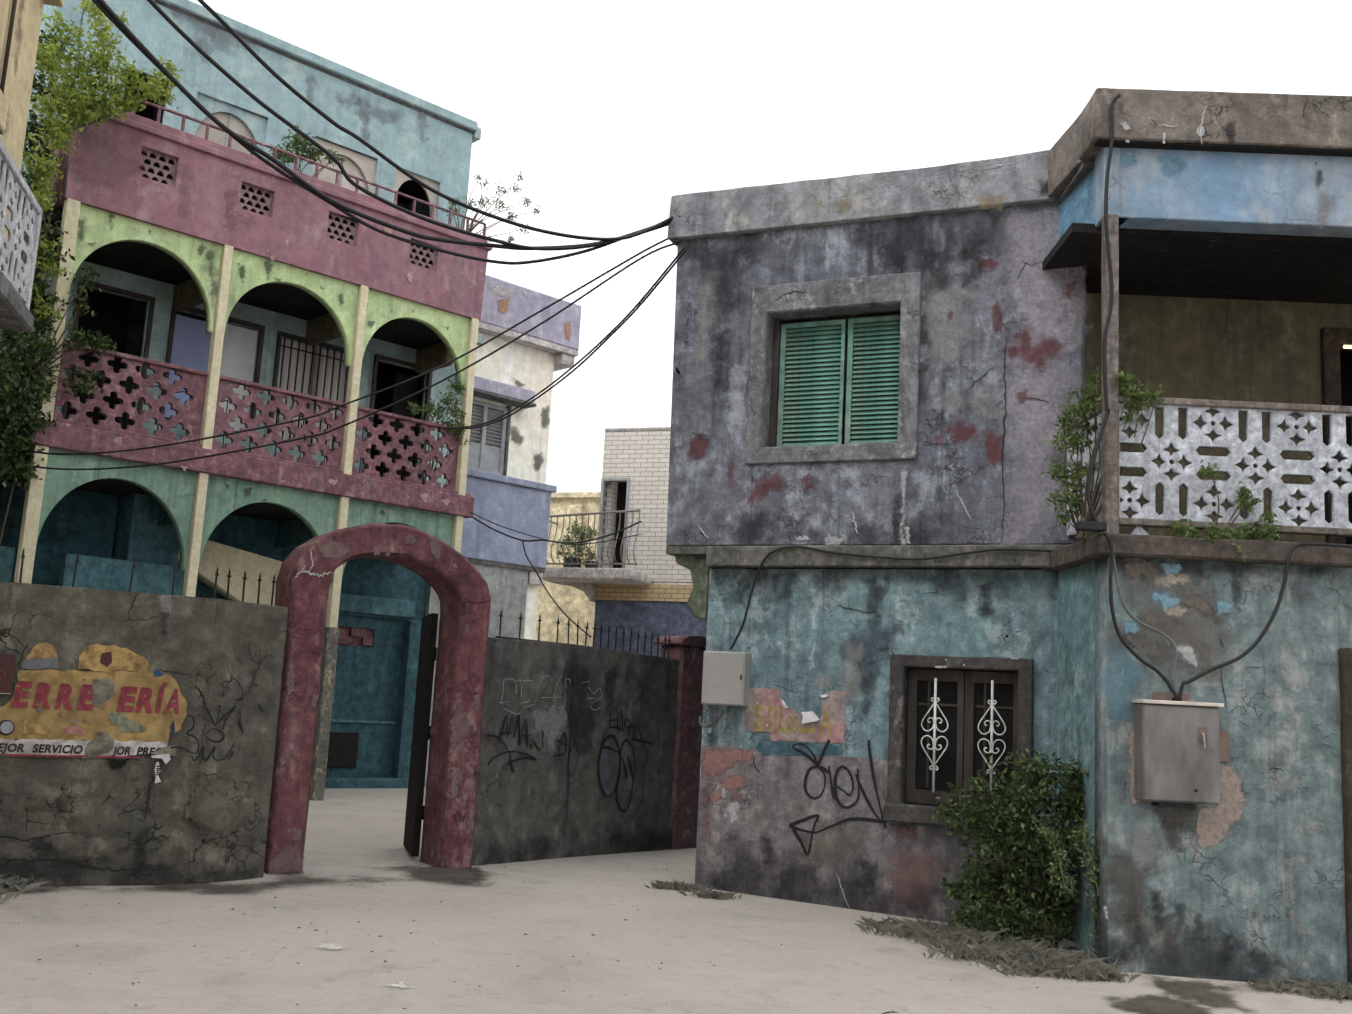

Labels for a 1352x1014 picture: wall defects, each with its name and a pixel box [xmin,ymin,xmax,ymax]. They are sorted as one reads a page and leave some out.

water stain [865,217,997,288]
peeling [935,183,1084,545]
water stain [892,471,927,545]
crack [295,551,332,577]
peeling [1152,563,1191,617]
crack [157,640,273,727]
peeling [1177,645,1197,667]
crack [138,777,154,823]
peeling [1196,764,1247,849]
crack [0,831,154,879]
water stain [116,827,336,894]
water stain [1109,904,1288,1014]